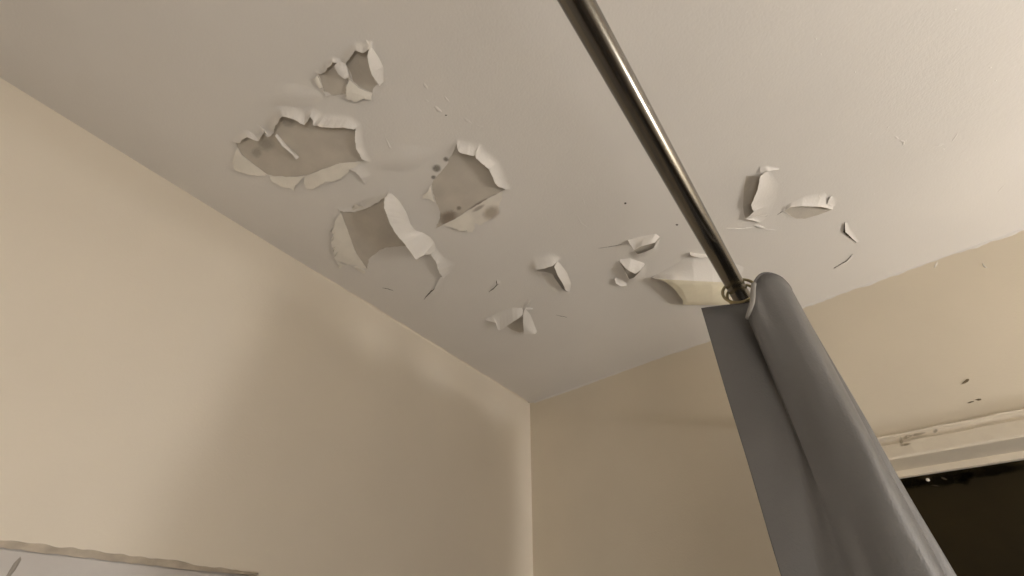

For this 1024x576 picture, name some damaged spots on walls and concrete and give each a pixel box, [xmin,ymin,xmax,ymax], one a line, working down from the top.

peeling [228,39,513,301]
peeling [743,165,837,225]
peeling [527,250,573,297]
peeling [614,234,732,305]
peeling [486,298,537,334]